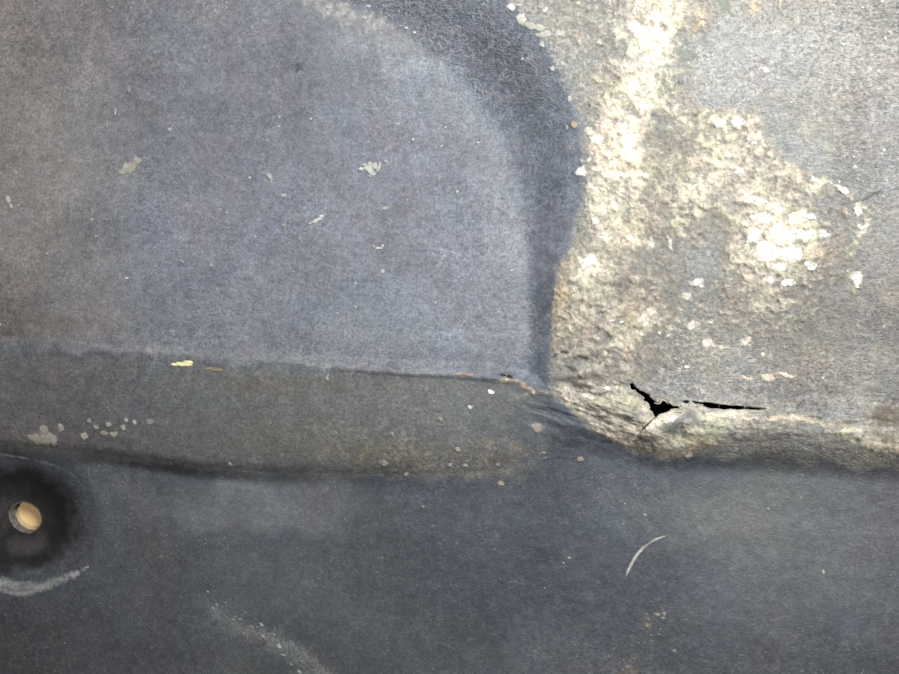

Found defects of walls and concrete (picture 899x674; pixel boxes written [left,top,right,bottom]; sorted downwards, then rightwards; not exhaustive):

leakage [544,0,730,257]
crack [630,383,762,418]
leakage [0,566,89,596]